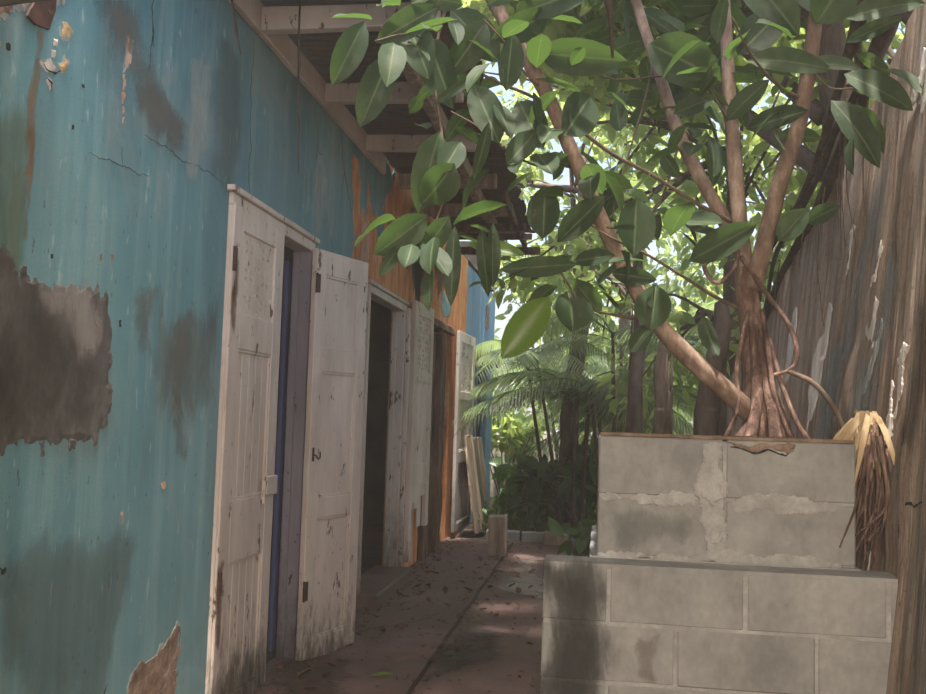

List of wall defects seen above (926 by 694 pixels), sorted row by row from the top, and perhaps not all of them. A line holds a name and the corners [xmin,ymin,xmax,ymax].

peeling [0,3,32,21]
peeling [38,21,73,91]
peeling [912,47,926,114]
crack [89,148,151,177]
peeling [861,240,884,394]
peeling [806,302,833,433]
peeling [884,342,910,445]
peeling [127,621,181,694]